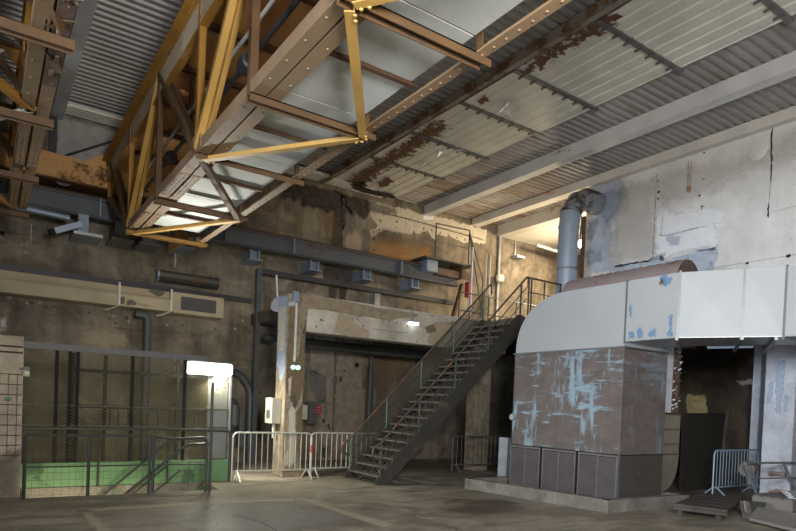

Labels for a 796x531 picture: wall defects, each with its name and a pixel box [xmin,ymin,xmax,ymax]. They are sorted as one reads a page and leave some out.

rust [519,8,623,74]
rust [347,120,453,188]
crack [767,128,795,218]
peeling [297,293,418,344]
peeling [277,296,301,478]
peeling [309,349,366,460]